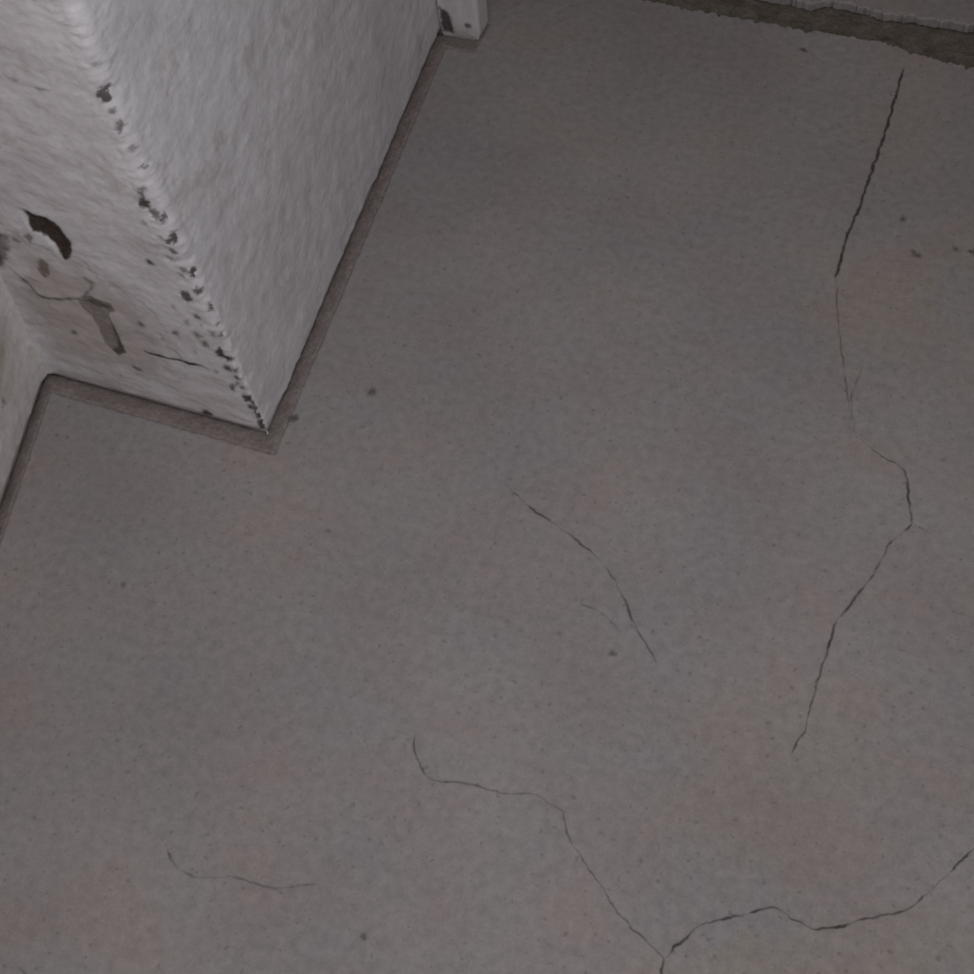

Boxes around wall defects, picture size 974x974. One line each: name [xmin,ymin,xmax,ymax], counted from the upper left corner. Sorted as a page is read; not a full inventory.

flaking render [96,84,112,102]
crack [835,71,904,277]
flaking render [139,192,168,223]
flaking render [24,210,72,260]
peeling [78,296,126,354]
flaking render [215,347,265,428]
crack [827,589,862,648]
crack [817,918,866,930]
crack [660,936,688,974]